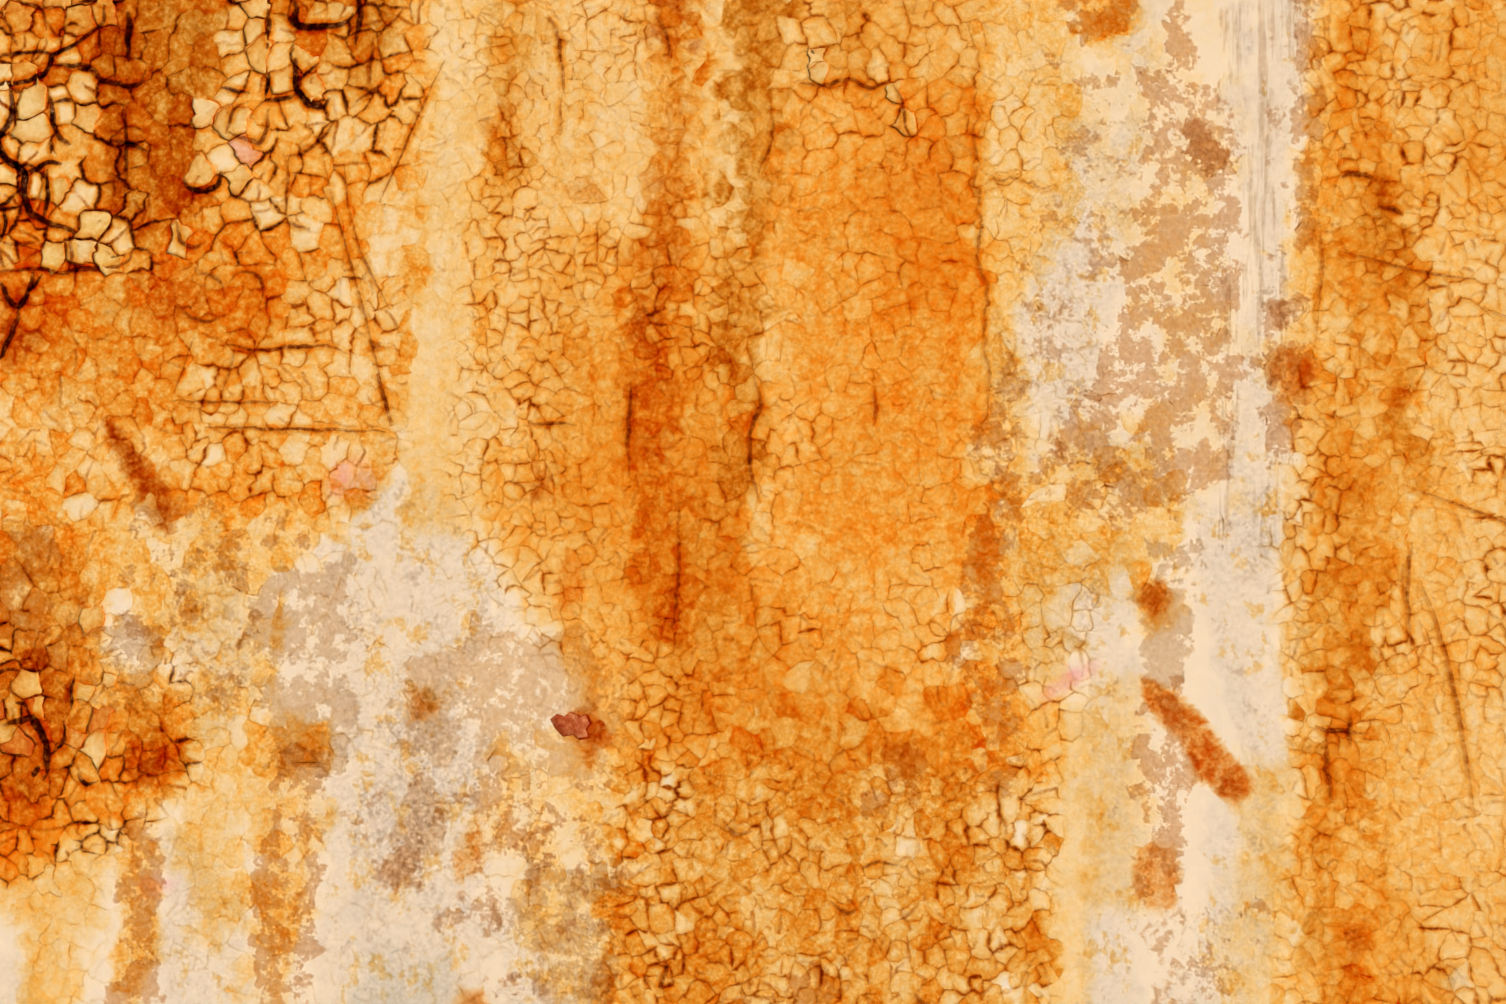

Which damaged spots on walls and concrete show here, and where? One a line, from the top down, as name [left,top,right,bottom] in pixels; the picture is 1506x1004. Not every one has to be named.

rust [91,0,231,220]
rust [696,0,798,111]
crack [764,0,981,185]
spalling [111,425,168,499]
crack [0,0,428,499]
rust [711,282,747,387]
crack [1292,0,1506,836]
crack [461,111,1059,1004]
rust [15,655,70,736]
crack [0,565,199,887]
peeling [550,712,592,740]
spalling [1146,691,1248,792]